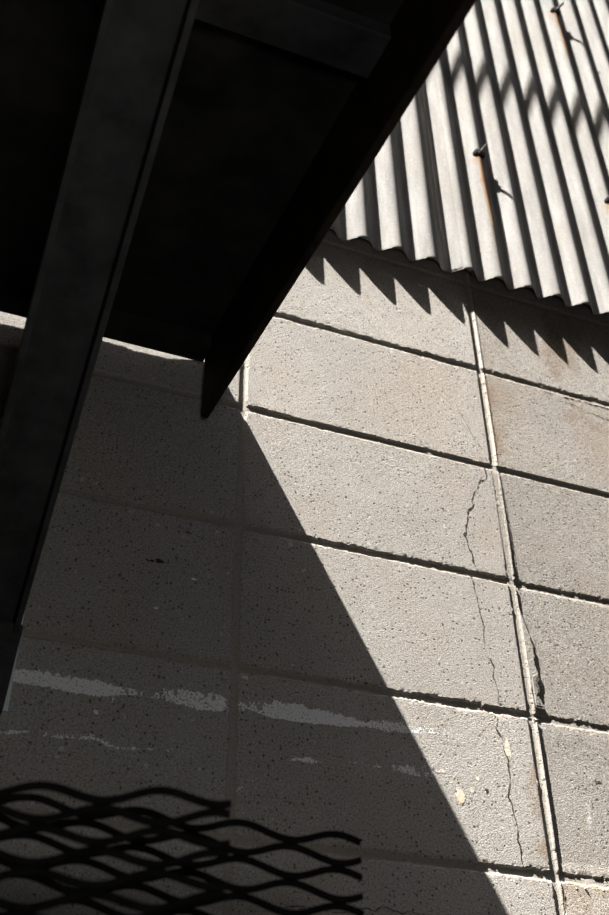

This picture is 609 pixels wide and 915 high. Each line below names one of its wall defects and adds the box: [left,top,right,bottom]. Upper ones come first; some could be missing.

rust [478,156,495,228]
crack [458,295,523,864]